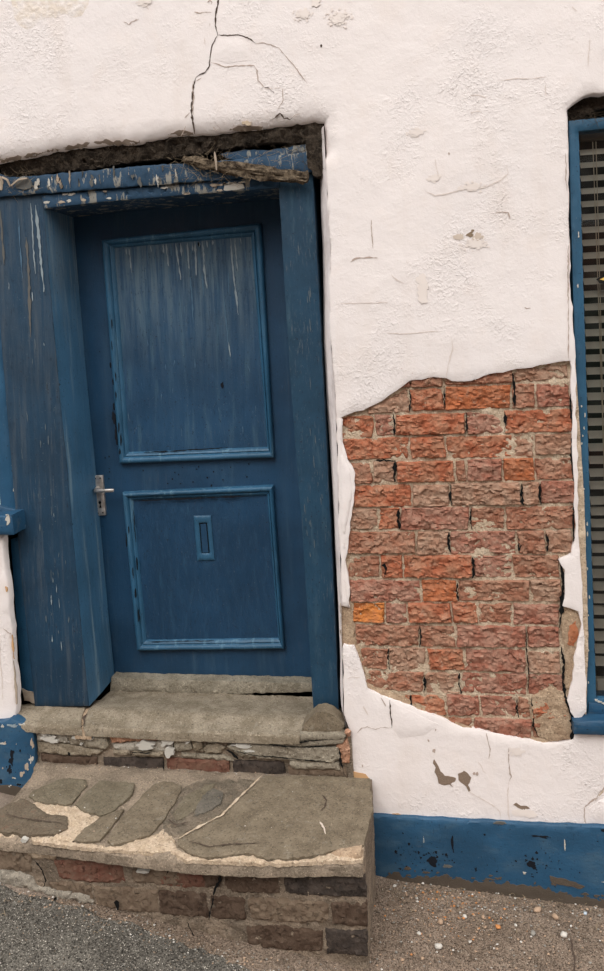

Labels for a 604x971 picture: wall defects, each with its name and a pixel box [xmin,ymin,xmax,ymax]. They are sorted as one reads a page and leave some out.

crack [182,0,305,134]
spalling [0,121,327,204]
flaking render [340,361,604,743]
peeling [0,738,34,787]
peeling [433,760,471,792]
crack [471,733,512,820]
peeling [395,832,455,871]
peeling [513,851,561,878]